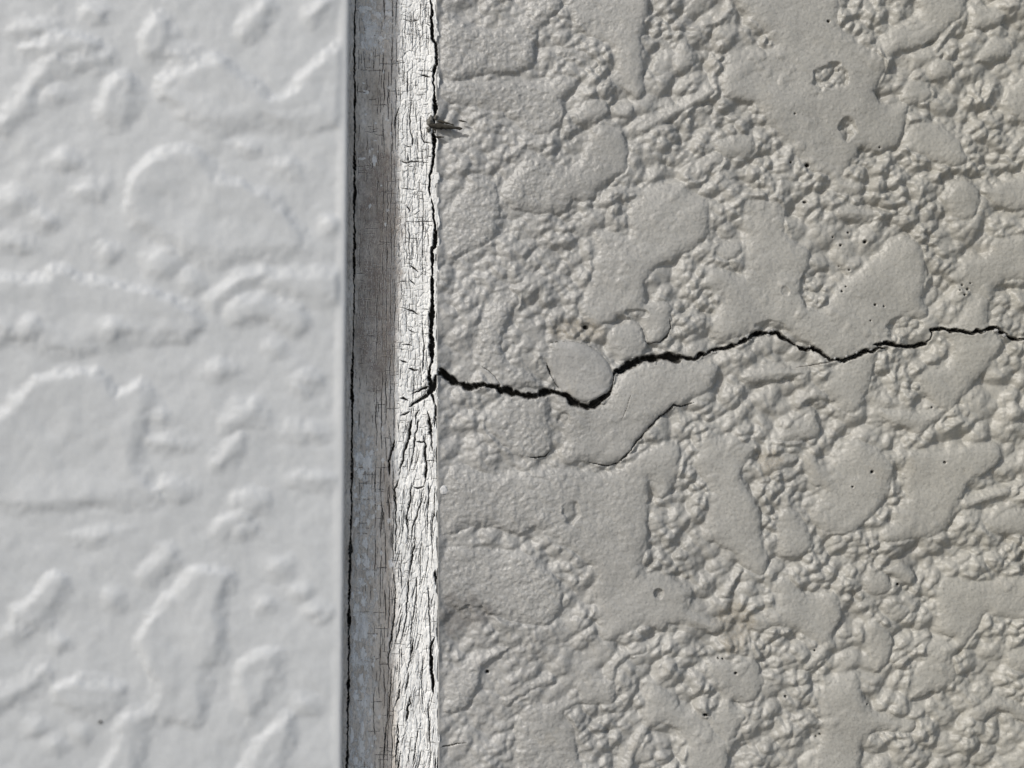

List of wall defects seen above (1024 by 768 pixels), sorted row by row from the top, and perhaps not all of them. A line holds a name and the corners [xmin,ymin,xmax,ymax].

crack [345,0,1024,768]